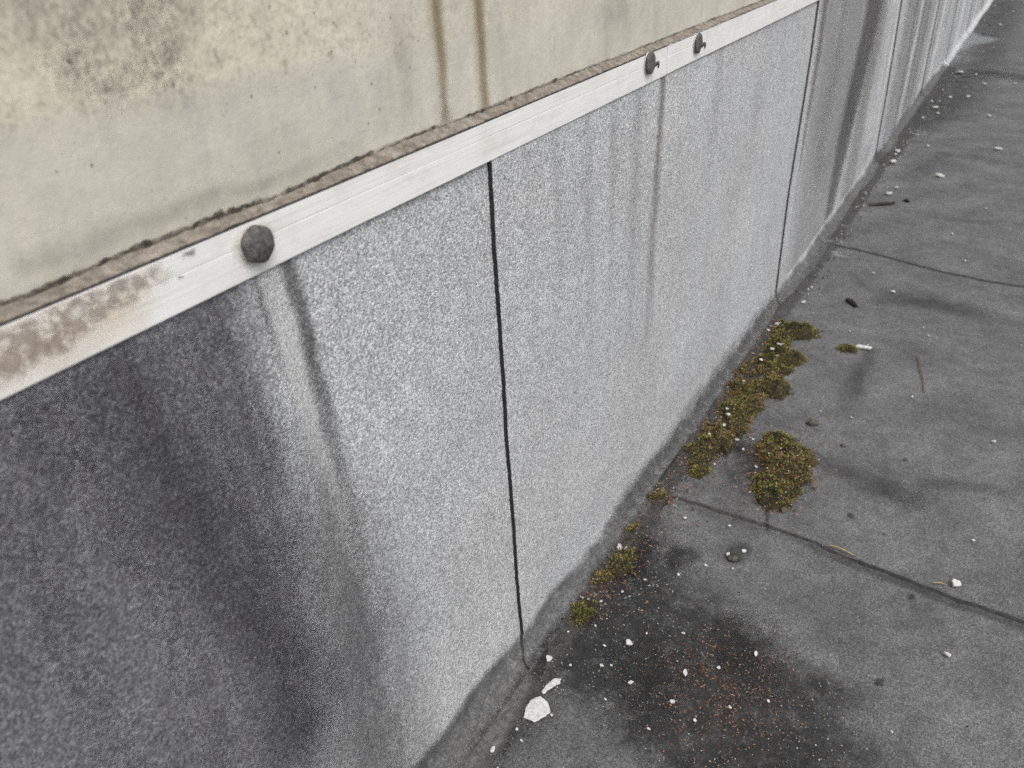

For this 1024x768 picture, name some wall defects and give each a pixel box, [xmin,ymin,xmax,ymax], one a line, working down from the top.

damp [0,294,316,768]
damp [265,260,322,460]